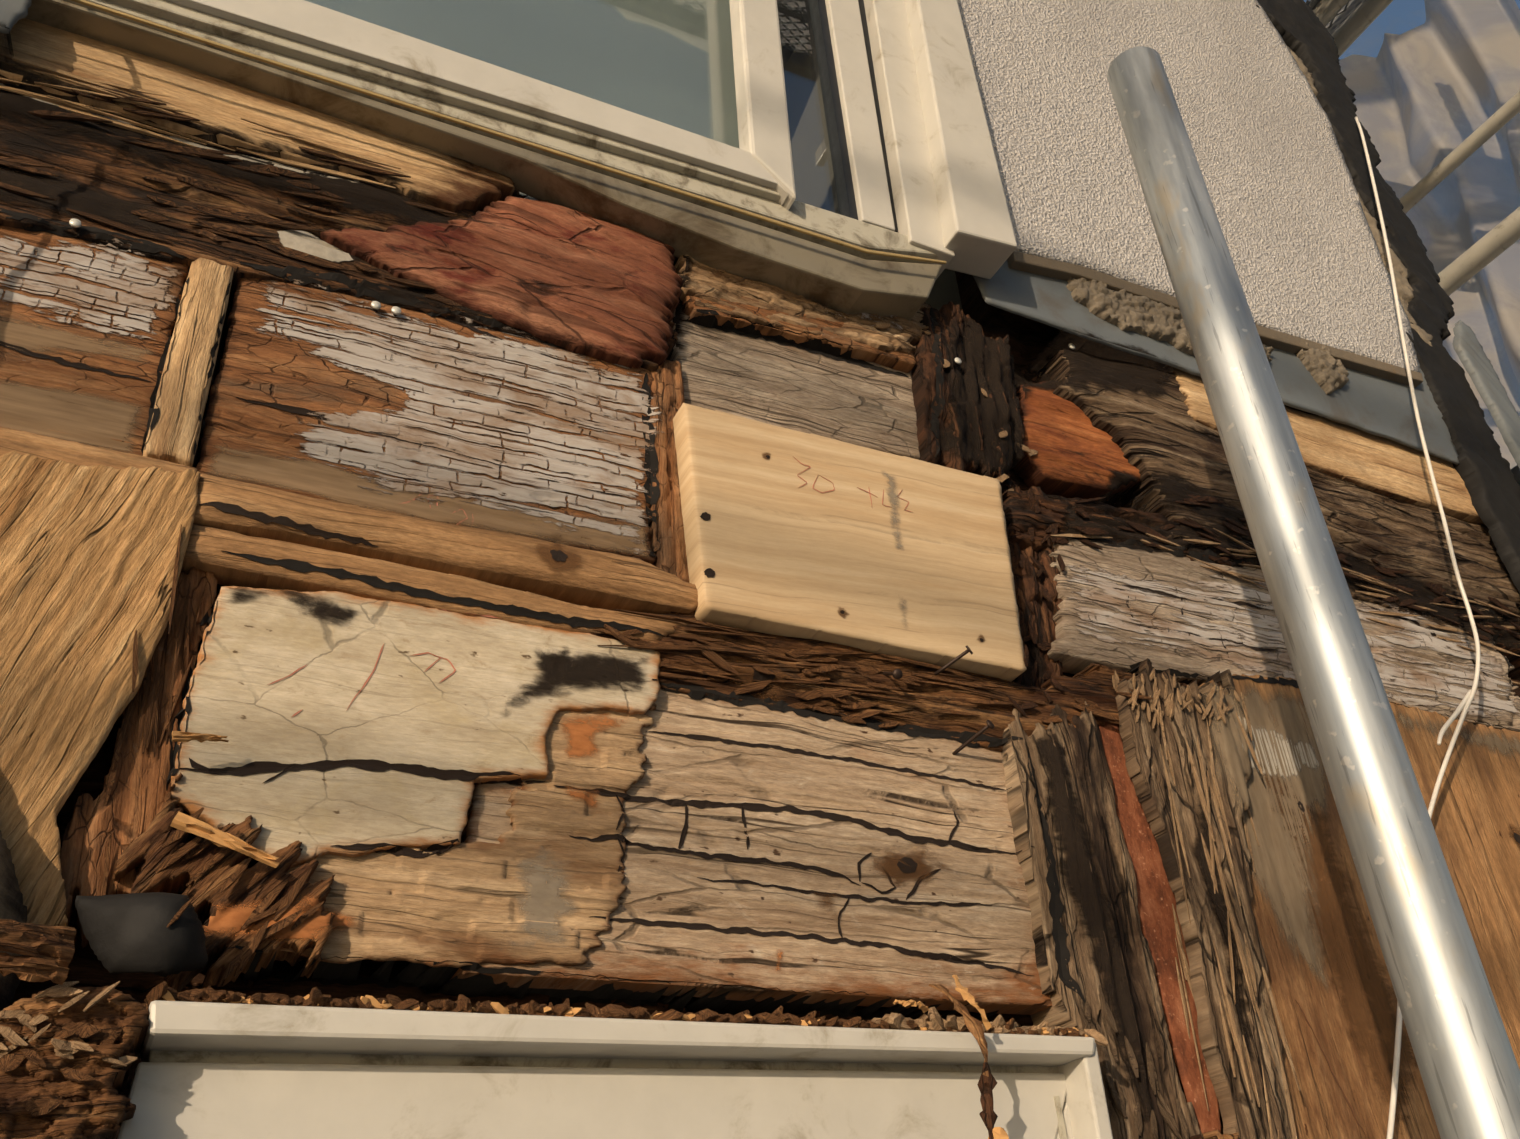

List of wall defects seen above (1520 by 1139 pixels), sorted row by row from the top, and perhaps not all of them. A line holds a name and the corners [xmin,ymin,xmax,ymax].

water stain [0,23,458,225]
water stain [0,165,178,237]
peeling [0,234,183,361]
peeling [277,230,353,262]
peeling [0,383,140,451]
peeling [210,279,665,556]
peeling [1354,600,1520,717]
crack [179,731,1034,976]
peeling [203,897,353,940]
water stain [1035,736,1153,1122]